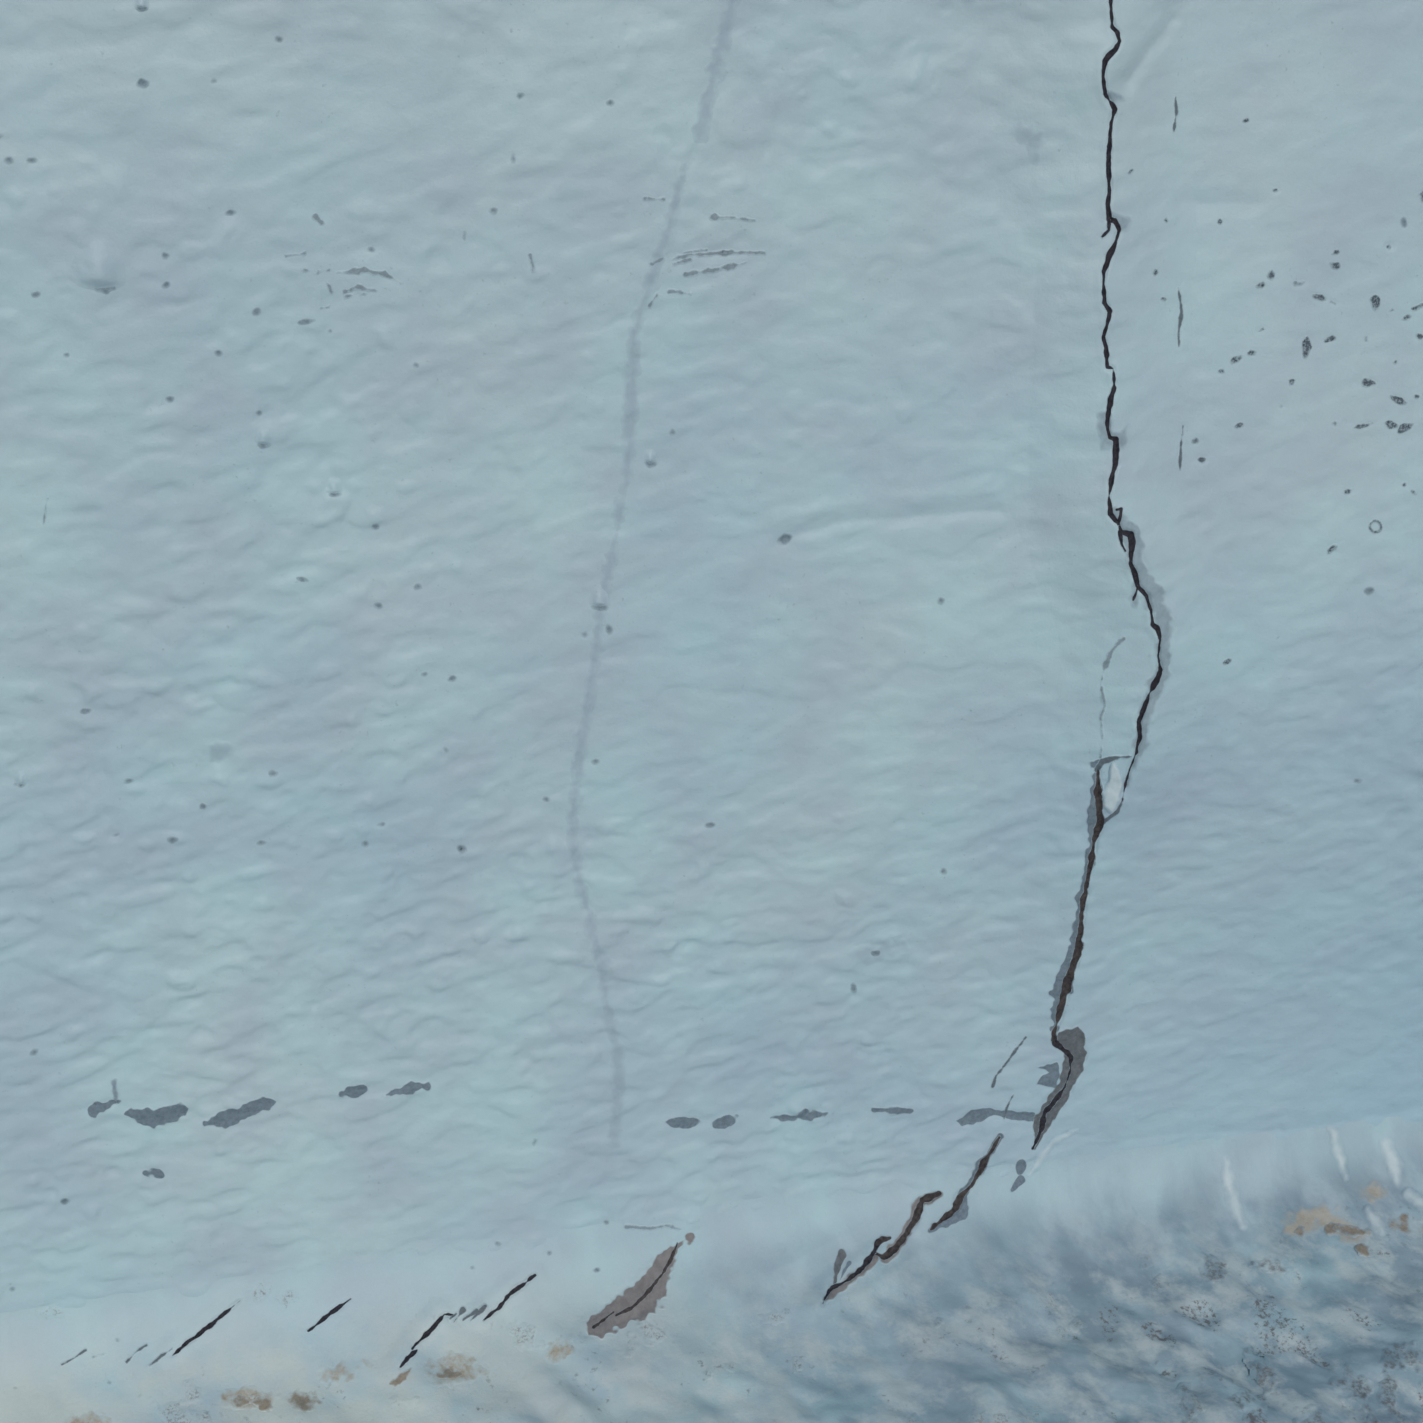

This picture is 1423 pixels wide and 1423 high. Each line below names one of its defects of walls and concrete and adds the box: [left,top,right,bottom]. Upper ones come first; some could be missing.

crack [1171,96,1179,133]
crack [1176,286,1185,349]
crack [819,0,1175,1306]
spalling [87,1077,277,1130]
spalling [337,1079,432,1099]
spalling [664,1113,741,1130]
spalling [767,1107,830,1123]
spalling [870,1105,915,1117]
rust [1280,1201,1418,1257]
crack [60,1299,242,1368]
crack [305,1297,353,1333]
crack [389,1272,539,1387]